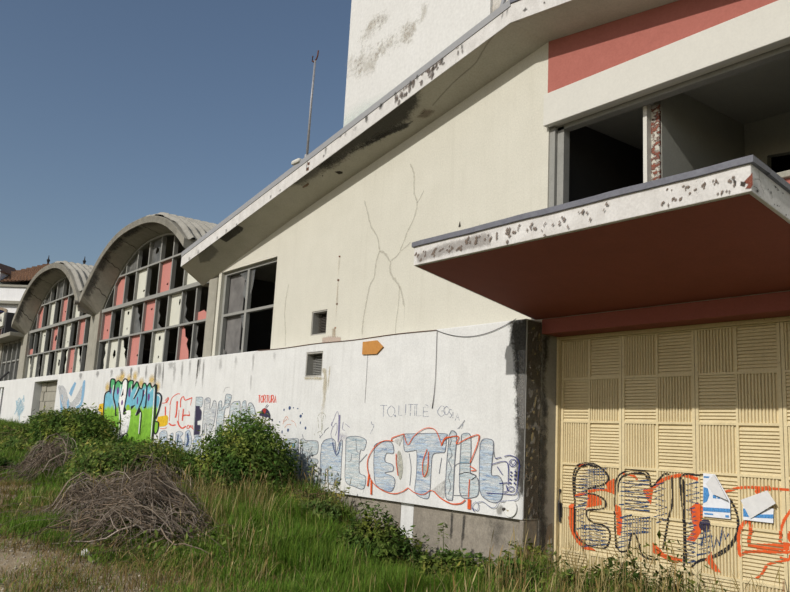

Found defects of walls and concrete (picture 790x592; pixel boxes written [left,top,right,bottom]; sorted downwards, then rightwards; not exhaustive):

water stain [295,56,445,184]
spalling [651,104,661,181]
peeling [661,173,776,206]
peeling [414,216,569,261]
water stain [510,319,549,559]